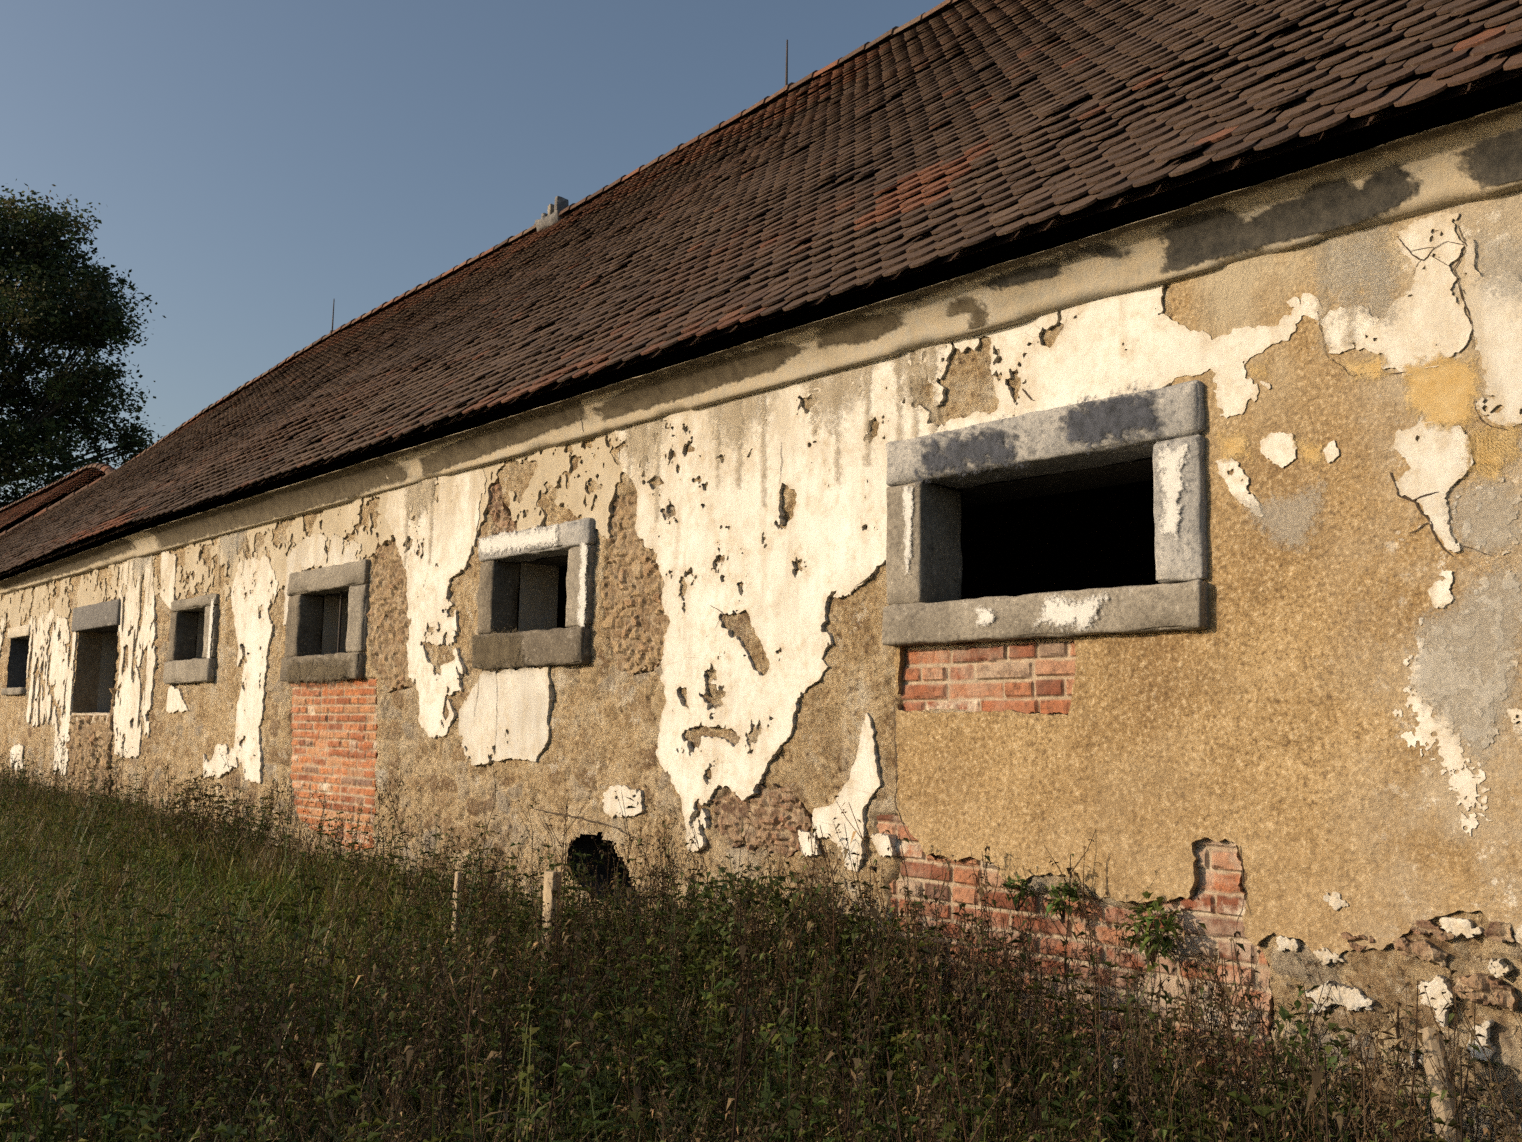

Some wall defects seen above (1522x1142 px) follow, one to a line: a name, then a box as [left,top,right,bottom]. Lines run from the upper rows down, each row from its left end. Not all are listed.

spalling [533,196,569,236]
leakage [0,104,1522,658]
peeling [26,212,1522,852]
peeling [10,743,25,771]
flaking render [798,713,1274,1094]
flaking render [1340,932,1374,952]
flaking render [1392,919,1520,1011]